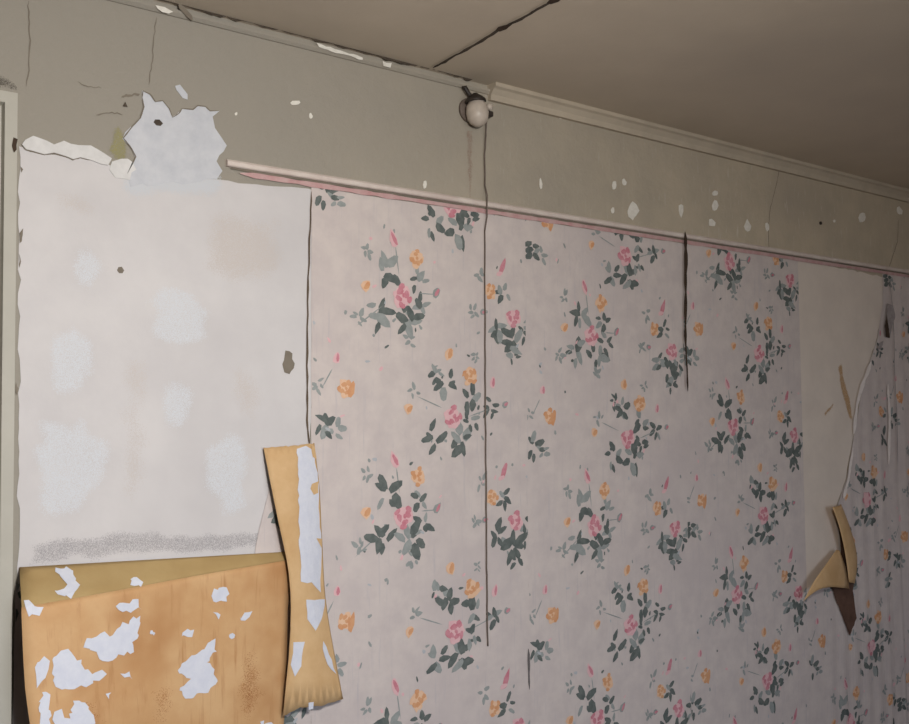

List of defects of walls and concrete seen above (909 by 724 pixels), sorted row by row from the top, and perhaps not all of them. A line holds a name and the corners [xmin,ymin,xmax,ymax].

crack [97,0,560,115]
flaking render [12,85,343,715]
peeling [804,505,857,635]